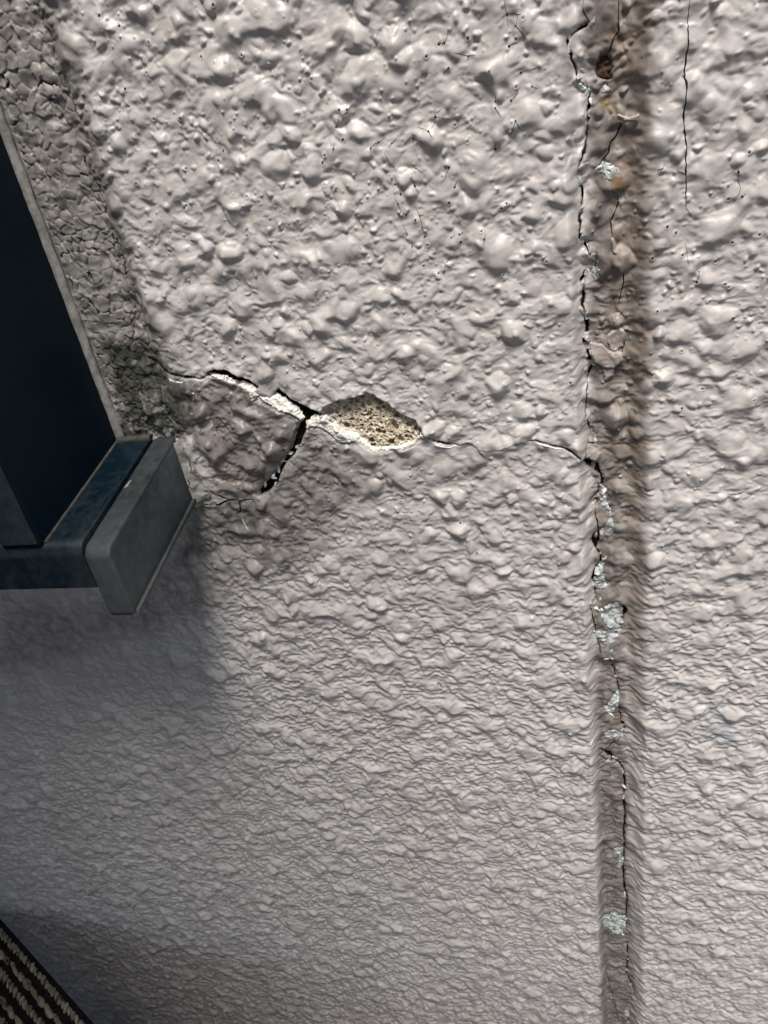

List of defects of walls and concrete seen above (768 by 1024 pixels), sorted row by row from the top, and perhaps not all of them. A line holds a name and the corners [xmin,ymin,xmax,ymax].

crack [36,74,67,101]
leakage [612,0,652,88]
crack [658,3,691,216]
crack [370,107,457,265]
leakage [616,99,651,384]
crack [60,233,356,514]
spalling [319,393,423,453]
crack [421,0,634,1024]
peeling [594,563,609,590]
peeling [593,483,614,537]
peeling [592,602,625,660]
leakage [619,397,646,541]